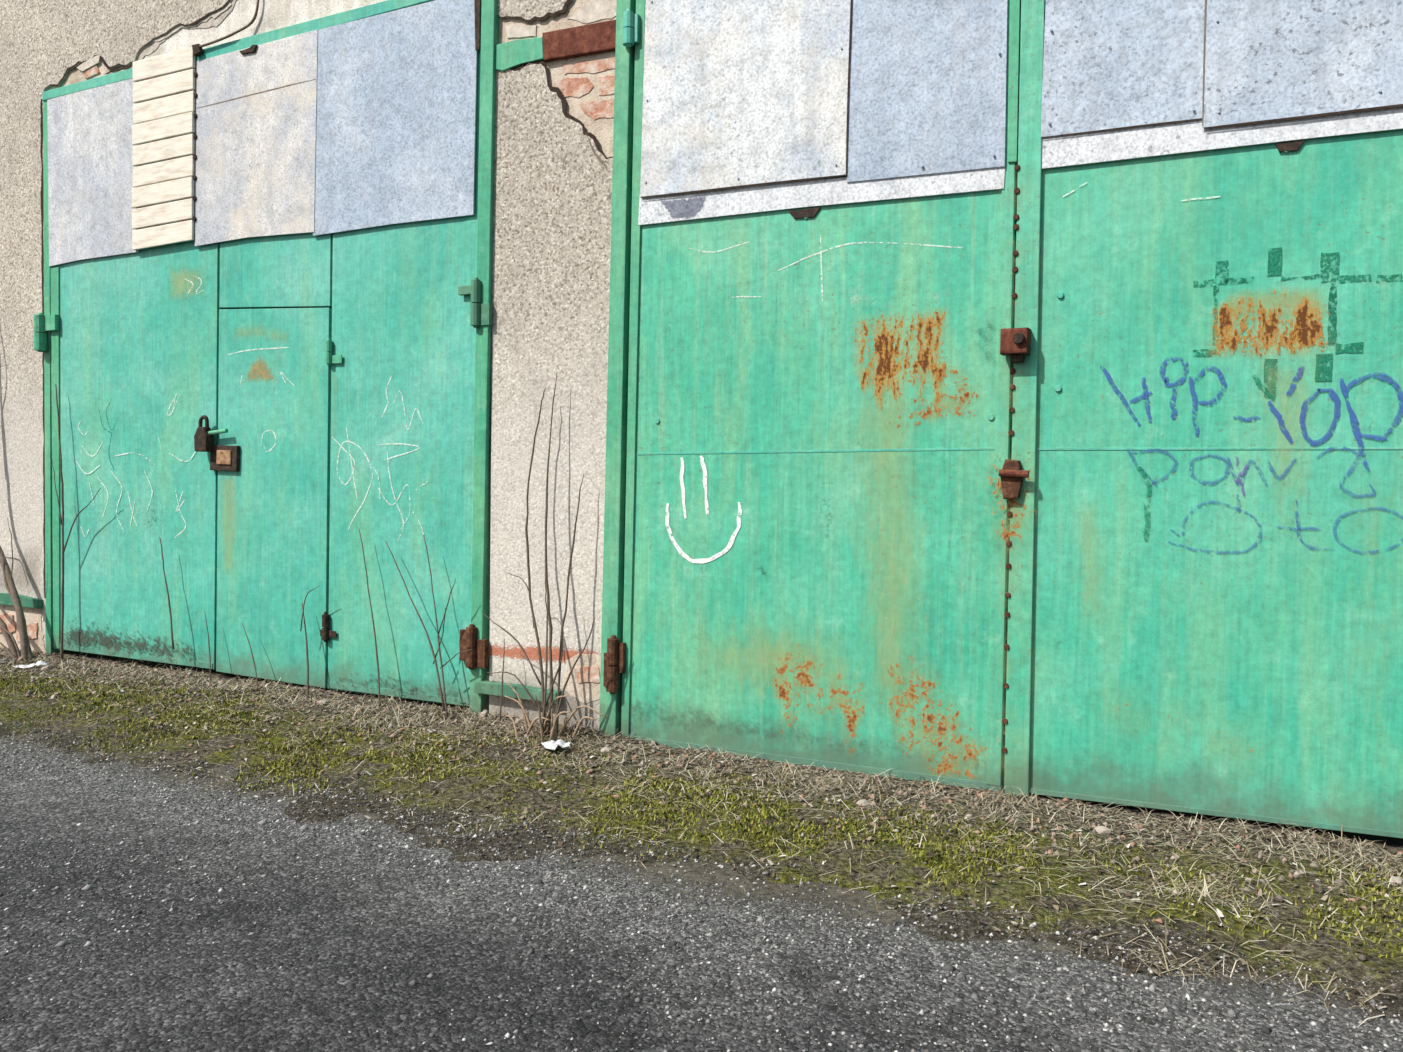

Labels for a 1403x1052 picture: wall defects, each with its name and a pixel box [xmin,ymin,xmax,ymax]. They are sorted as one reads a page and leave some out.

spalling [45,0,387,91]
spalling [497,0,617,44]
spalling [511,51,615,159]
corrosion [855,311,978,434]
corrosion [1212,290,1327,357]
corrosion [986,434,1036,542]
corrosion [763,644,1011,780]